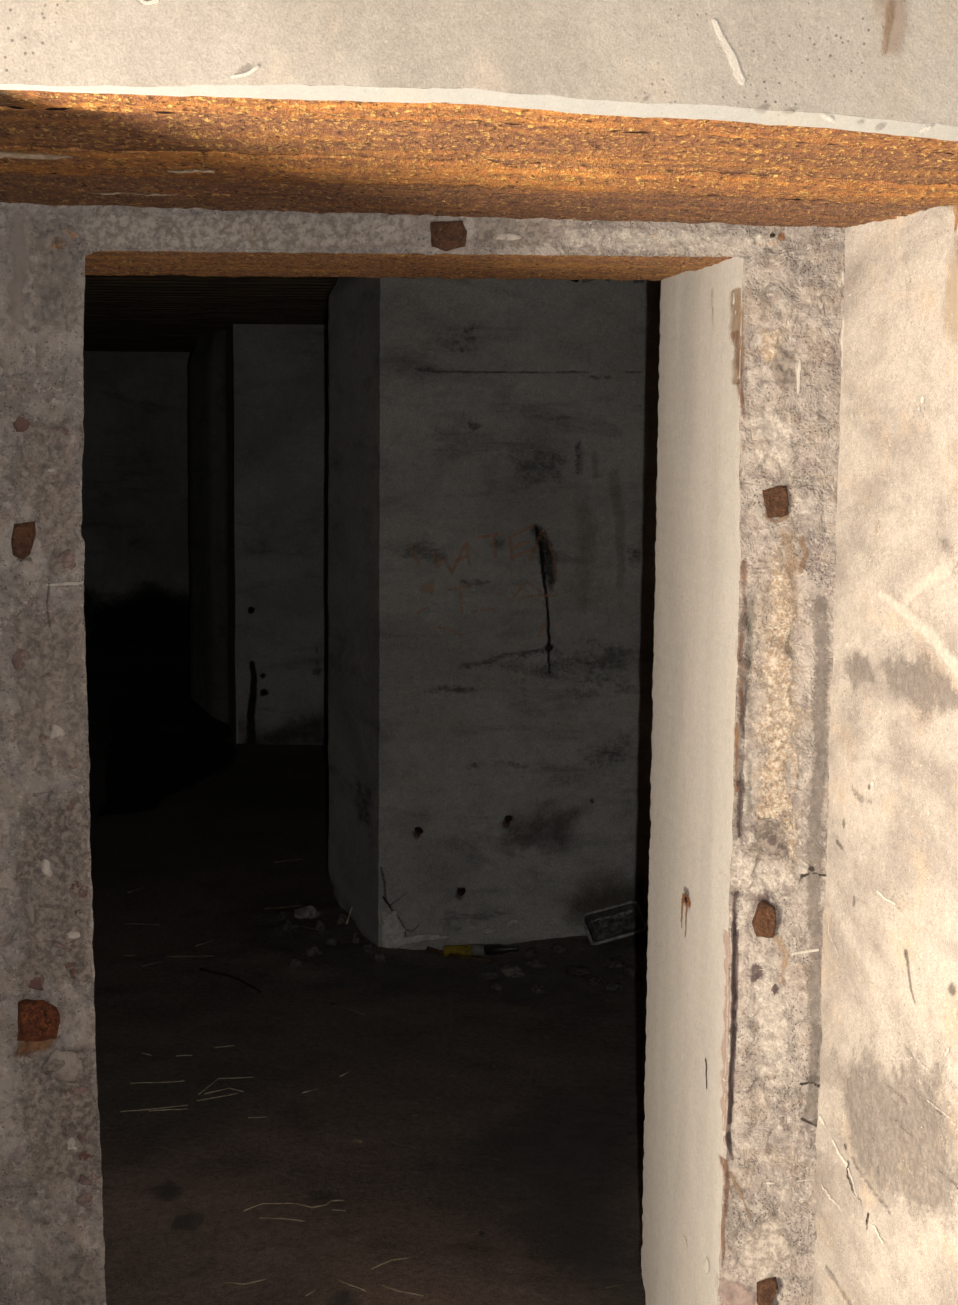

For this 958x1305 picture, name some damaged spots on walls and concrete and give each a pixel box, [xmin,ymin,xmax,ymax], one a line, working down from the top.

rust [681,888,691,935]